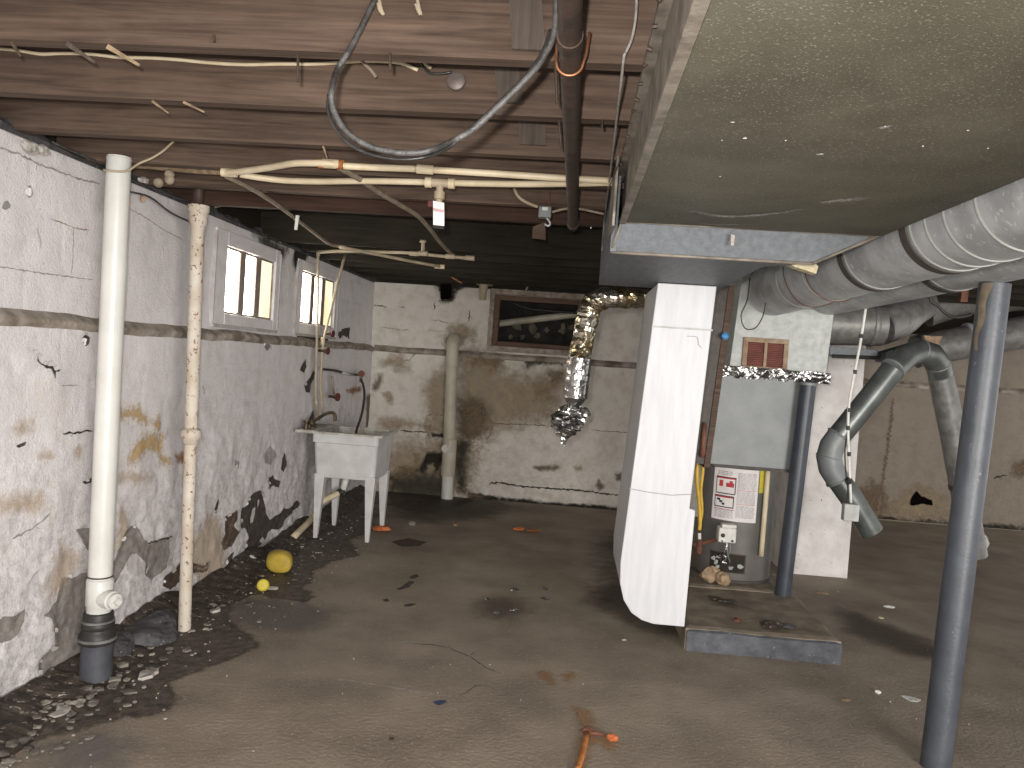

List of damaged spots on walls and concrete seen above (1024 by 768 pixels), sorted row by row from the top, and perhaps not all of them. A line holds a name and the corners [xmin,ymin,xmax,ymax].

crack [32,350,76,386]
peeling [77,525,90,550]
spalling [113,525,180,590]
spalling [193,561,211,573]
spalling [214,446,300,565]
water stain [253,357,617,602]
crack [490,482,618,496]
peeling [39,570,88,675]
water stain [30,602,259,742]